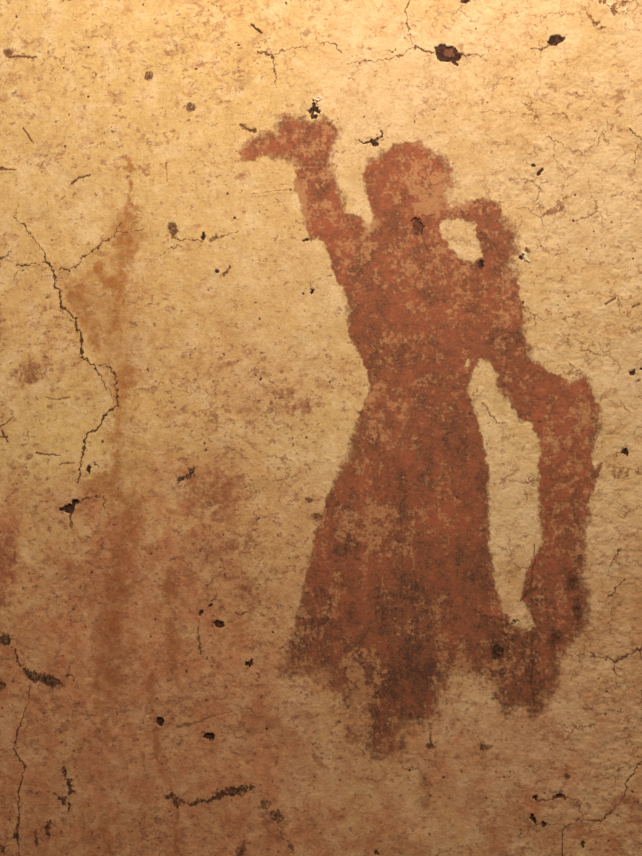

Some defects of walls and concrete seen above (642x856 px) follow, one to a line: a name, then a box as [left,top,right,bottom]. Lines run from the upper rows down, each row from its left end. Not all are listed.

crack [257,0,434,82]
spalling [599,0,628,16]
crack [14,207,142,528]
crack [571,647,642,684]
crack [5,649,31,856]
crack [534,761,642,856]